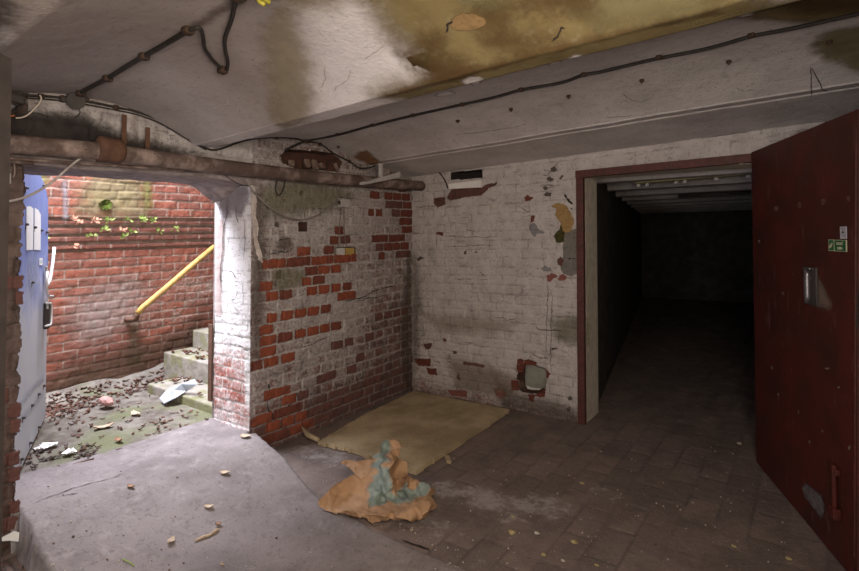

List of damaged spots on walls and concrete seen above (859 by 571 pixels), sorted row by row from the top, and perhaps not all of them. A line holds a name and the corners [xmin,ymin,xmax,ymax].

spalling [449,13,487,31]
water stain [368,0,859,99]
spalling [280,149,342,172]
spalling [434,169,497,207]
peeling [543,167,574,233]
peeling [368,190,423,261]
peeling [529,215,545,237]
peeling [541,257,567,282]
peeling [250,185,382,445]
peeling [414,343,437,376]
peeling [448,362,485,397]
spalling [494,358,550,402]